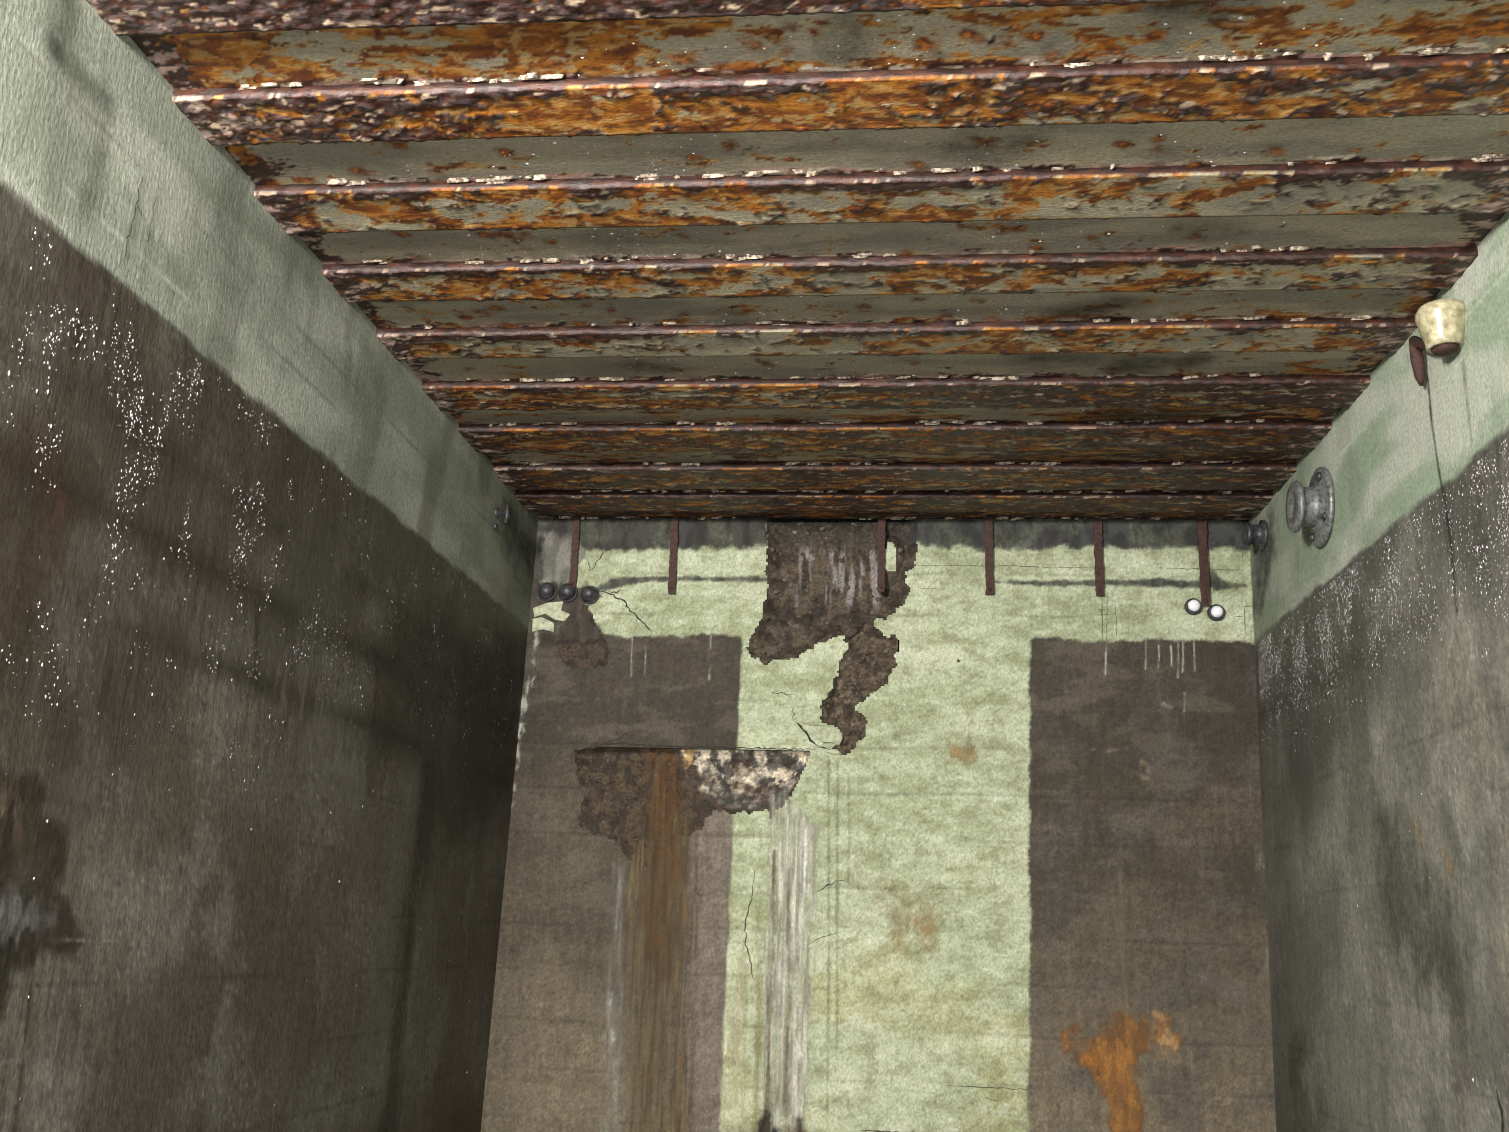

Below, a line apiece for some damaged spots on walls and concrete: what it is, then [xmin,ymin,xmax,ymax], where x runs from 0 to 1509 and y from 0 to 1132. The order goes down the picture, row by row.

rust [915,38,937,51]
rust [960,29,983,41]
rust [1003,32,1060,63]
rust [1113,141,1135,149]
rust [958,224,1044,250]
rust [1427,377,1443,492]
peeling [527,516,649,671]
spalling [574,516,918,871]
leakage [0,772,79,1043]
leakage [732,796,819,1132]
rust [1062,1012,1181,1132]